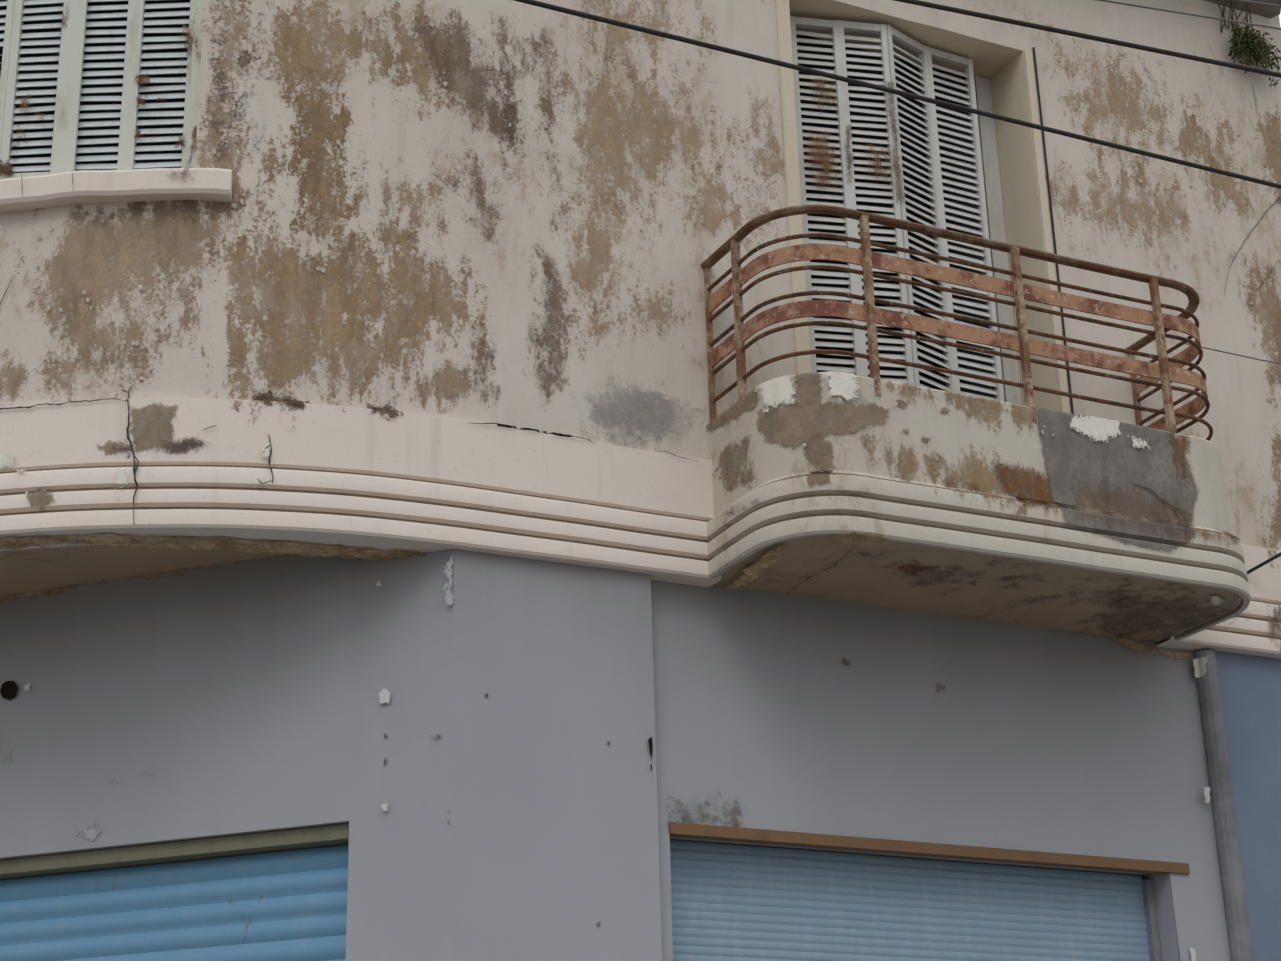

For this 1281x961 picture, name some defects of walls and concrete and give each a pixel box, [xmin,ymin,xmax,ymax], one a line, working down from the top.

peeling [1045,38,1254,258]
peeling [1256,105,1281,204]
peeling [0,0,784,500]
peeling [1234,252,1281,407]
crack [0,384,139,525]
leakage [164,440,204,453]
spalling [0,533,427,560]
spalling [831,532,890,546]
peeling [706,371,1071,513]
peeling [1070,414,1150,449]
leakage [1035,407,1198,552]
peeling [1262,427,1281,566]